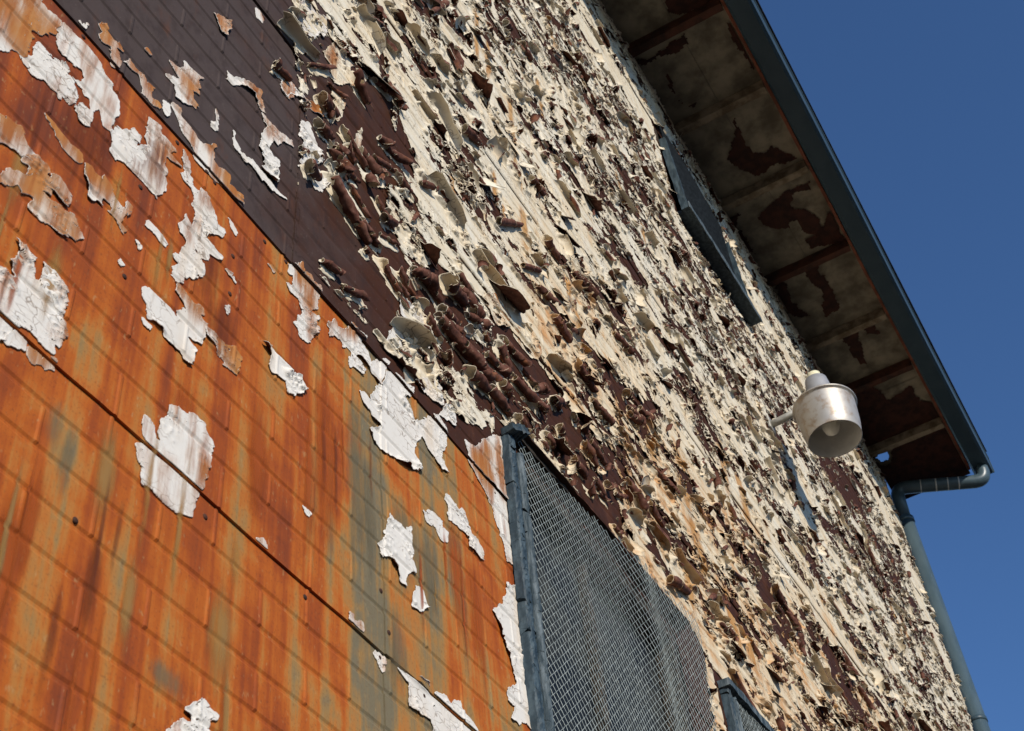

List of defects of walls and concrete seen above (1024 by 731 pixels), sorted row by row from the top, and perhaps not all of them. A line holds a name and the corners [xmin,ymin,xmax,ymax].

corrosion [474,14,491,76]
peeling [0,0,245,375]
corrosion [11,230,30,292]
corrosion [45,255,59,301]
corrosion [175,393,193,414]
peeling [226,0,973,731]
corrosion [99,442,114,501]
peeling [135,404,215,517]
corrosion [305,394,372,534]
corrosion [0,475,34,561]
corrosion [419,536,485,661]
peeling [166,698,219,731]